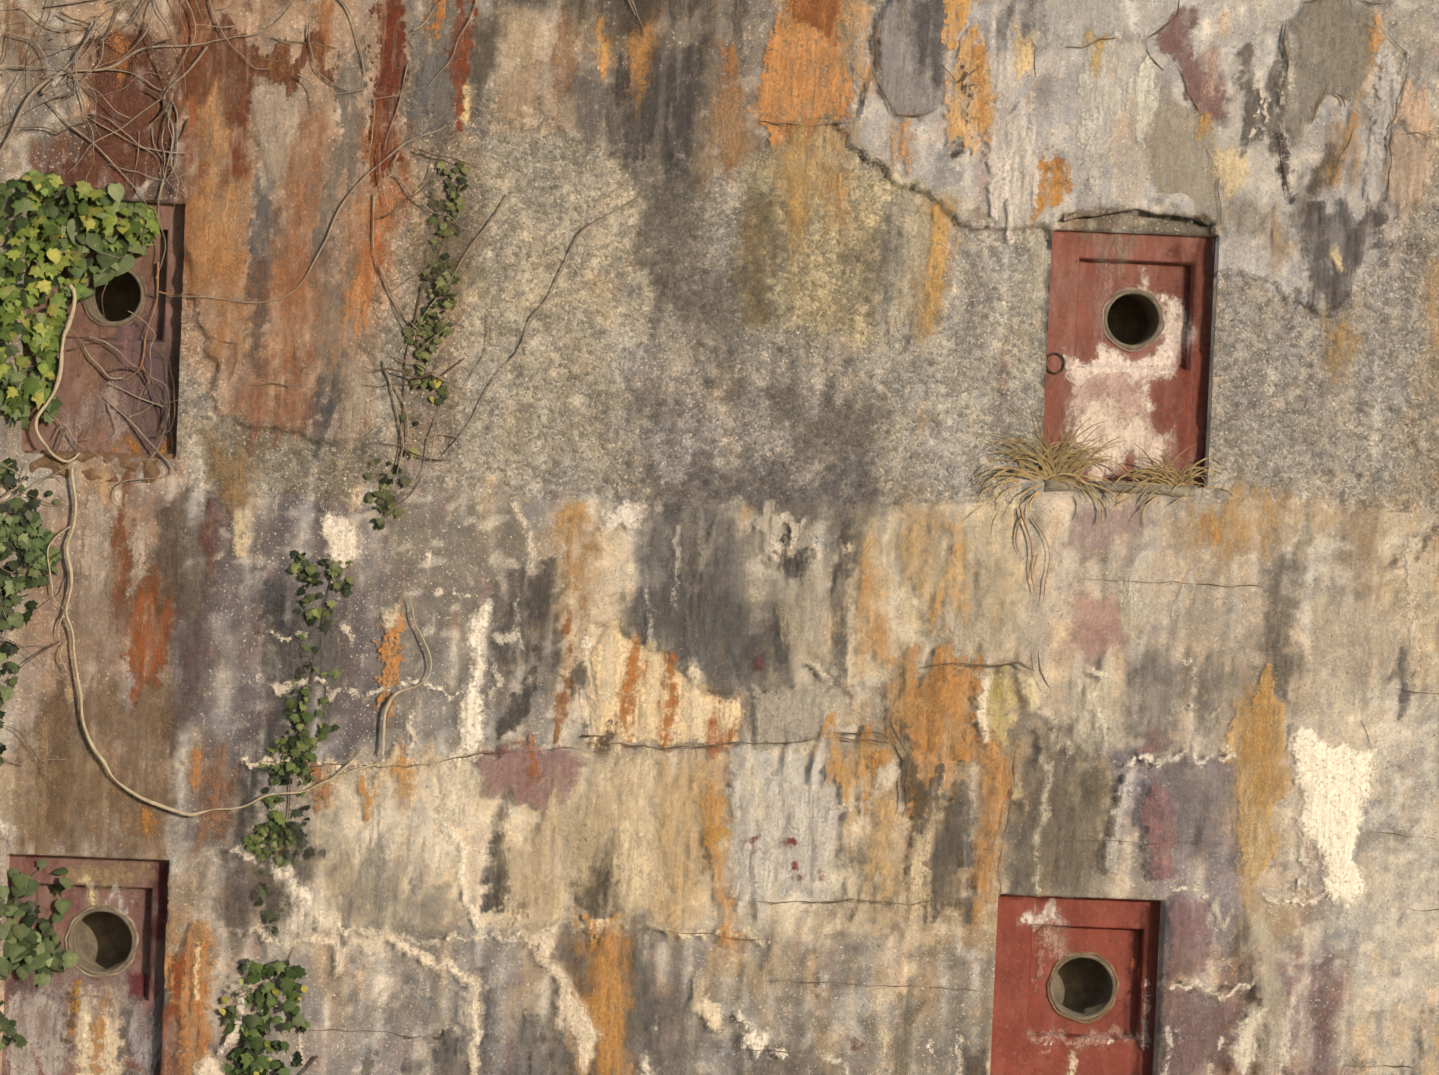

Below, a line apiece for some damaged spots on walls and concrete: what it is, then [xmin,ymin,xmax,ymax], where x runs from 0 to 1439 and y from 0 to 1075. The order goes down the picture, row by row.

rust [57,316,175,455]
rust [16,470,237,1075]
rust [46,0,341,387]
leakage [194,963,251,1075]
rust [338,0,413,358]
leakage [217,487,862,1075]
spalling [57,0,1439,519]
rust [748,0,880,233]
peeling [1073,595,1124,662]
peeling [1068,506,1143,554]
leakage [1027,958,1185,1075]
leakage [1170,726,1382,1075]